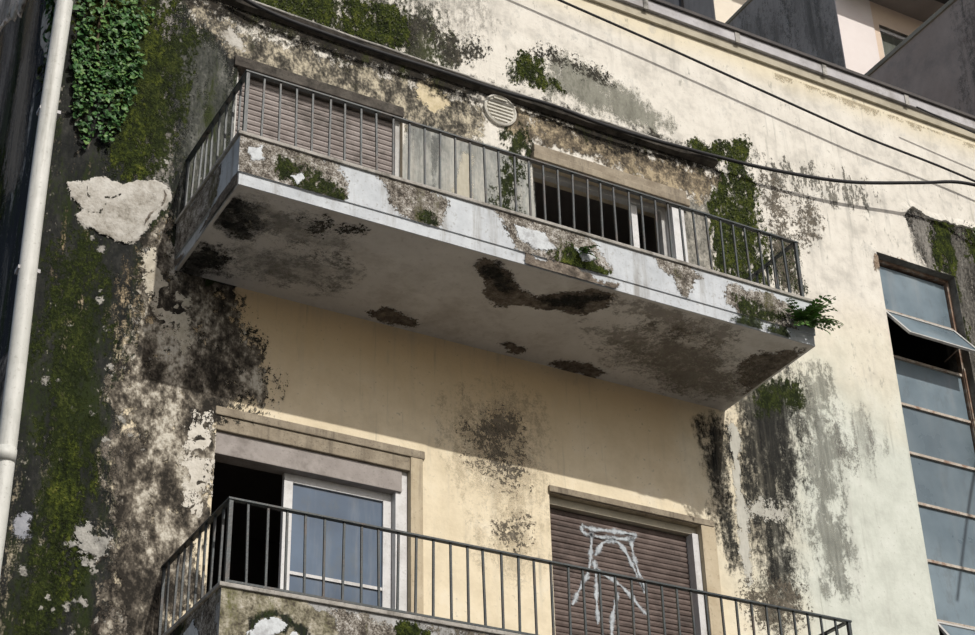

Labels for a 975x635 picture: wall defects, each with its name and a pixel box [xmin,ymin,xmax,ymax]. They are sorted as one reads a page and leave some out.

flaking render [0,0,40,219]
leakage [136,0,722,269]
peeling [38,135,397,635]
leakage [230,304,269,355]
leakage [212,366,288,437]
leakage [169,195,371,297]
spalling [365,306,420,328]
leakage [455,401,536,554]
leakage [694,363,875,635]